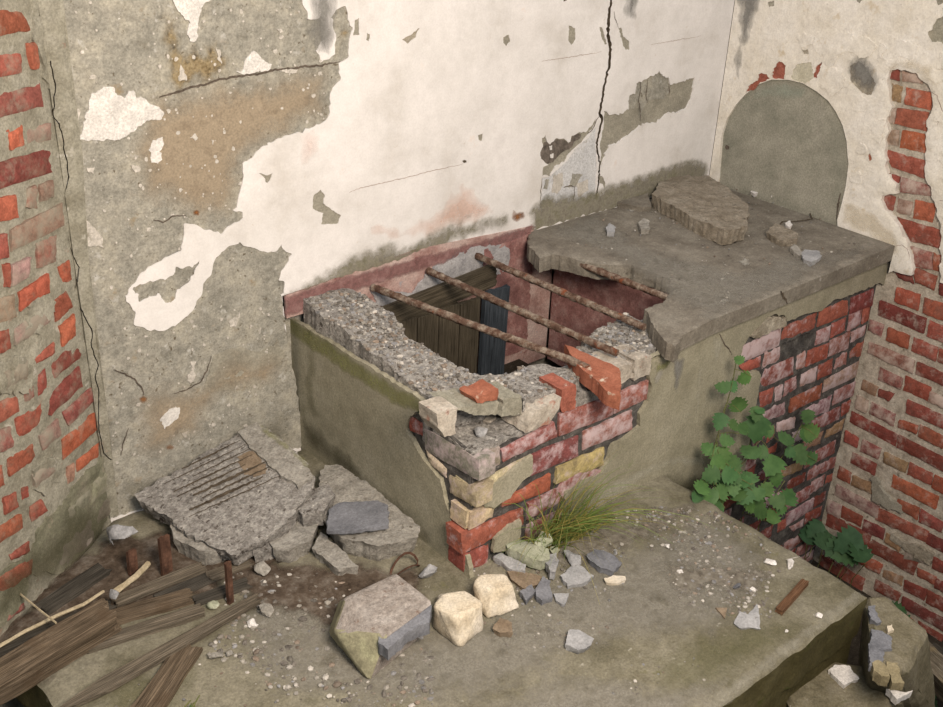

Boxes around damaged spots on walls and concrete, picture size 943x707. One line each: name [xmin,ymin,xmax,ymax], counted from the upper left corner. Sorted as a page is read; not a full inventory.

crack [50,61,69,189]
crack [589,0,629,193]
spalling [540,72,694,204]
flaking render [747,61,786,91]
flaking render [850,63,876,95]
peeling [928,17,943,43]
crack [68,239,110,459]
peeling [63,0,370,518]
flaking render [724,69,943,642]
flaking render [409,344,652,572]